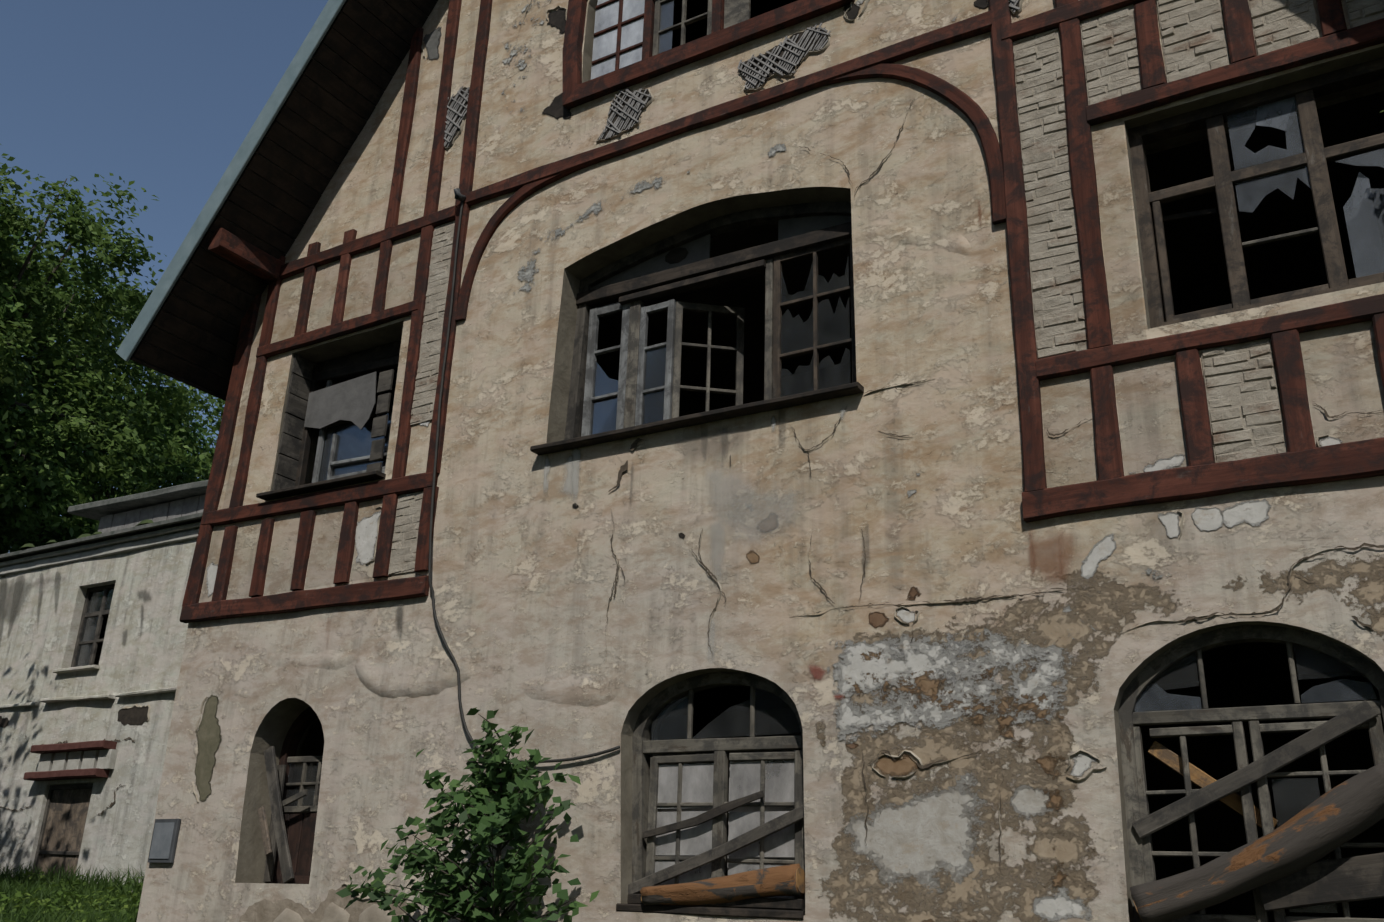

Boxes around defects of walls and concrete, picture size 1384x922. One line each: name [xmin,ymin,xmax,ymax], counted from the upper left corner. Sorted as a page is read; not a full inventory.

flaking render [501,0,567,113]
flaking render [542,93,572,119]
crack [796,99,915,195]
flaking render [842,0,870,22]
crack [793,379,933,478]
crack [605,437,649,658]
crack [691,528,726,655]
crack [789,505,1089,674]
flaking render [1158,499,1272,539]
flaking render [1222,554,1384,640]
flaking render [815,533,1191,922]